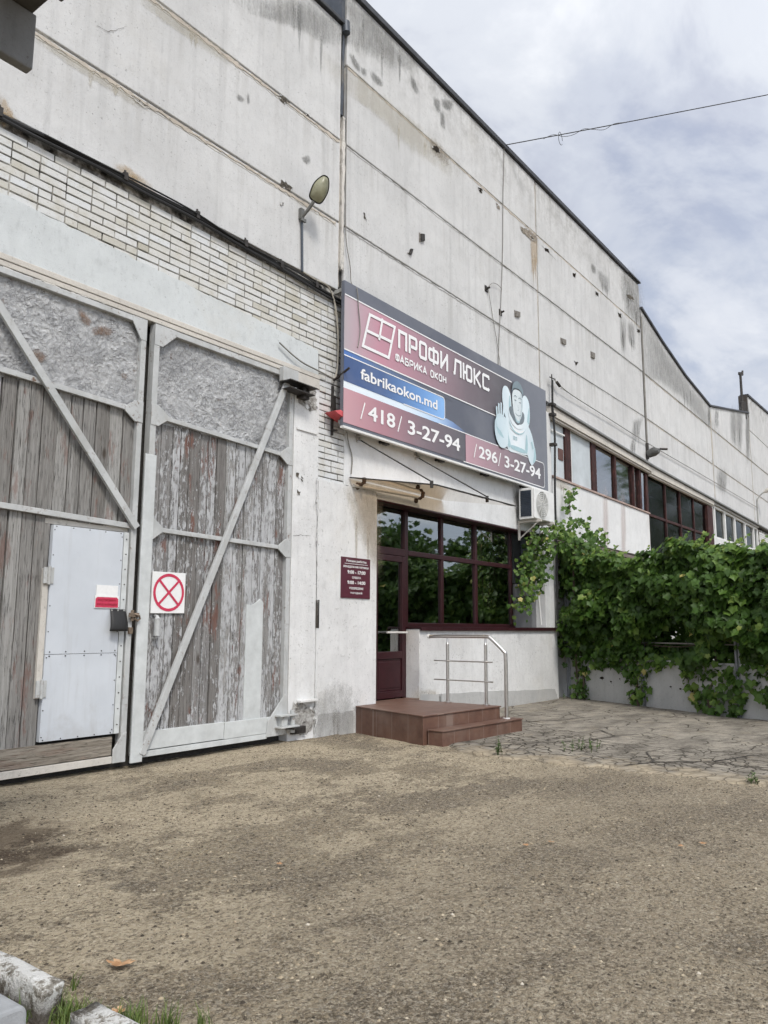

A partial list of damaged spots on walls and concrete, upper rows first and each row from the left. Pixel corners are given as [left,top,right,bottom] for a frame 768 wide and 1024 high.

spalling [292,702,317,737]
crack [496,713,766,766]